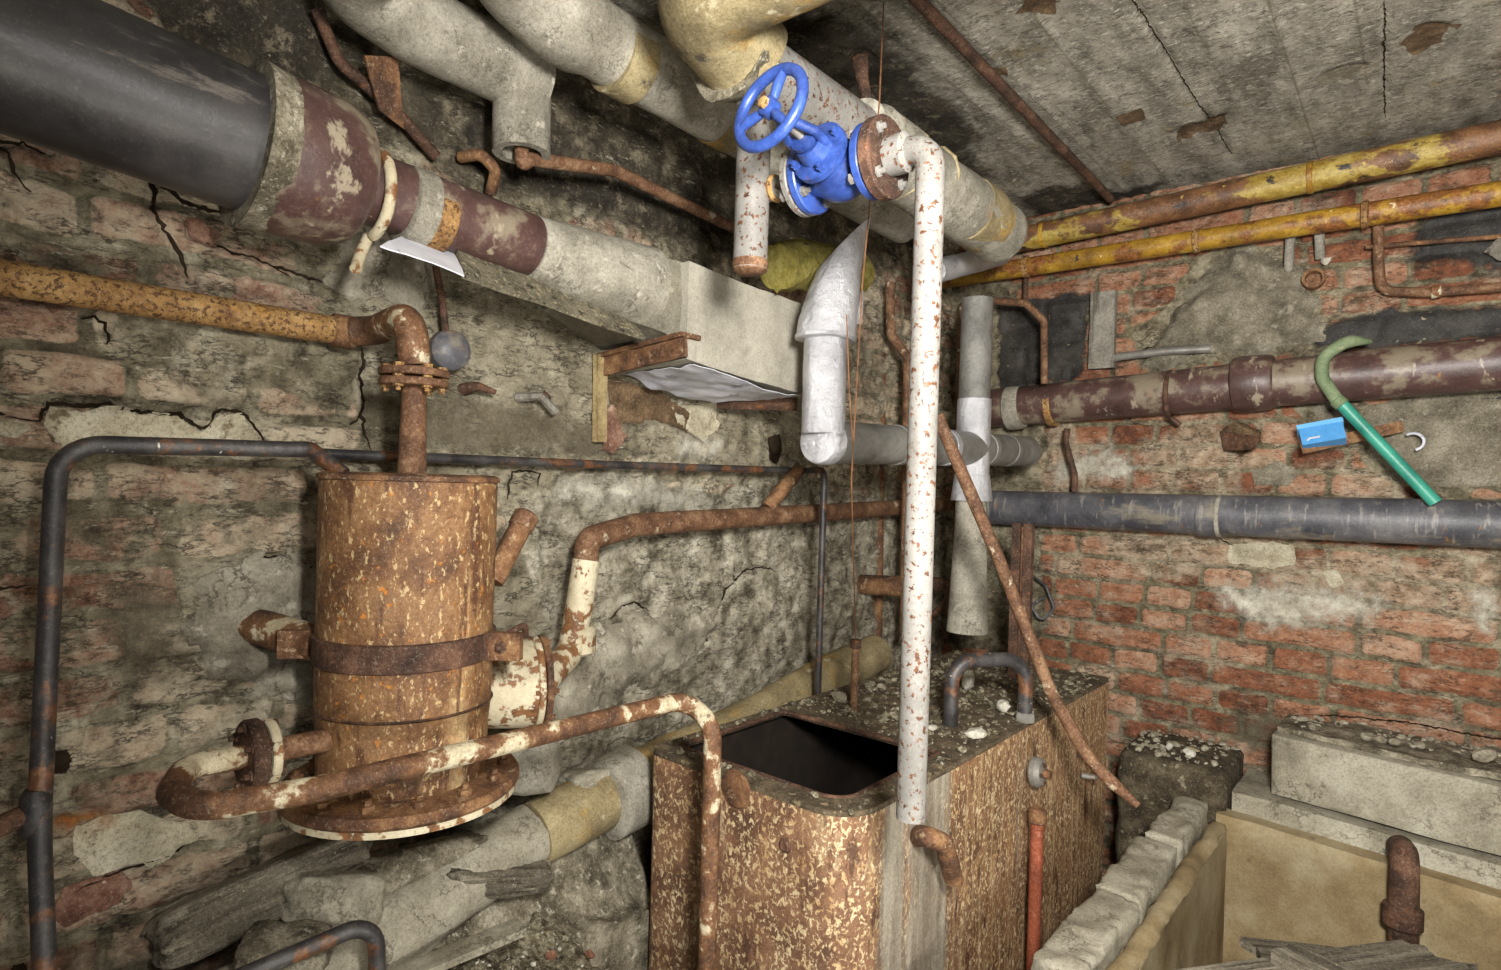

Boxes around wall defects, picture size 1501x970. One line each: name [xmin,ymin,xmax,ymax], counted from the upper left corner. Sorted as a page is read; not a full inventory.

crack [1379,3,1387,118]
crack [0,140,46,192]
water stain [928,101,994,167]
crack [149,183,324,283]
spalling [0,405,258,461]
crack [0,401,265,441]
spalling [1222,422,1301,486]
spalling [1311,390,1501,488]
crack [0,584,28,592]
spalling [1227,541,1296,569]
spalling [1323,570,1345,588]
spalling [55,809,199,927]